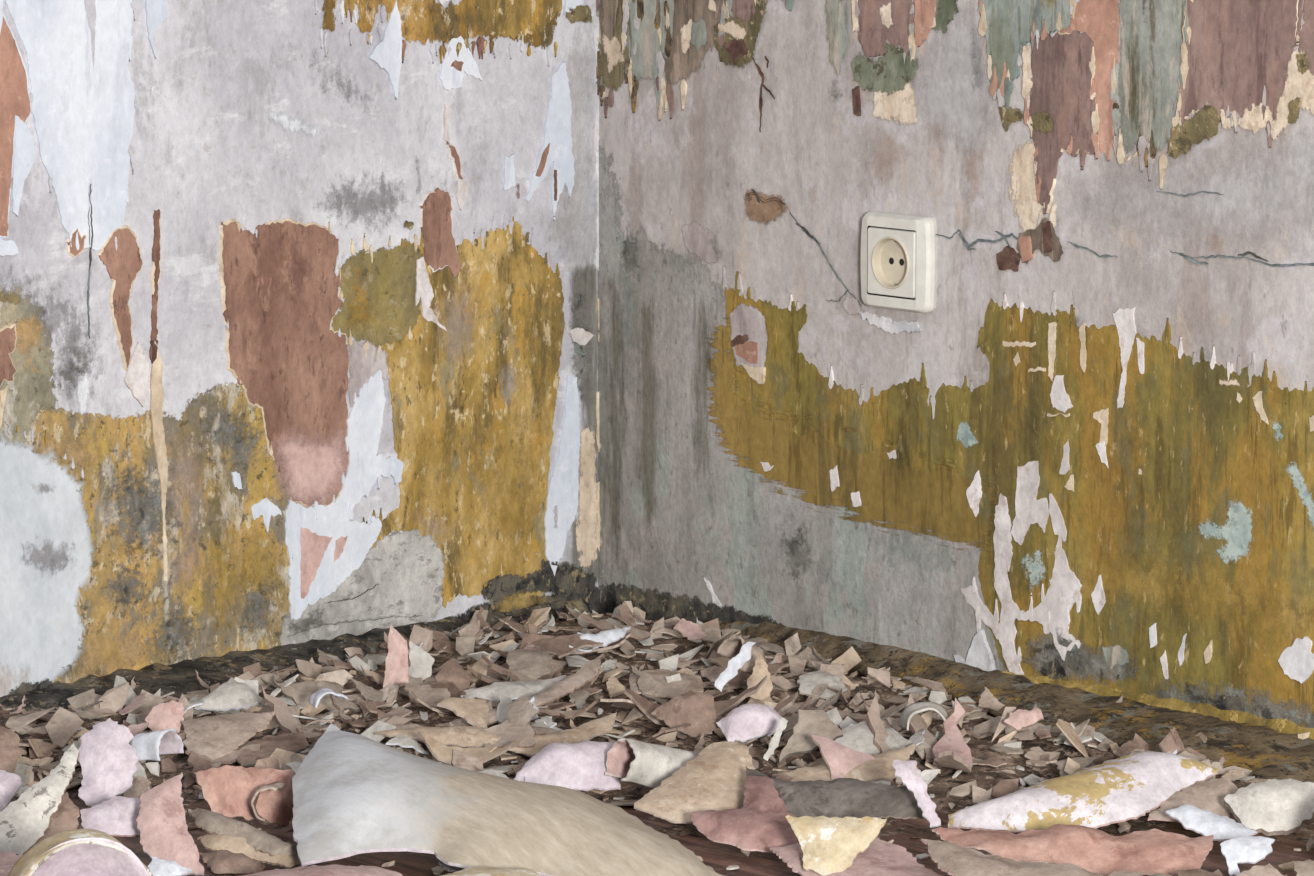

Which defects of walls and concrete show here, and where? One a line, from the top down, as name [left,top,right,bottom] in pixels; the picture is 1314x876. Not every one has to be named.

peeling [1024,19,1100,214]
peeling [1172,0,1314,148]
crack [936,230,1018,251]
crack [1070,242,1117,257]
crack [1156,190,1224,198]
crack [1170,251,1314,267]
peeling [218,218,390,533]
water stain [445,145,1006,671]
peeling [1093,307,1144,468]
flaking render [0,384,1214,876]
peeling [1278,636,1314,684]
flaking render [1224,778,1314,836]